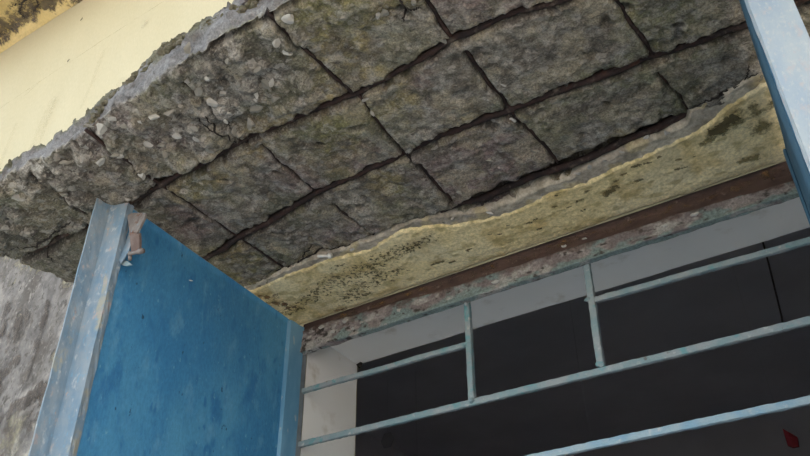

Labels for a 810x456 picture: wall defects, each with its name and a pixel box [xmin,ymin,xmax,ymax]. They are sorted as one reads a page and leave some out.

leakage [0,0,82,45]
spalling [793,0,810,37]
spalling [0,0,766,290]
leakage [700,101,774,147]
leakage [602,156,662,197]
leakage [278,235,438,315]